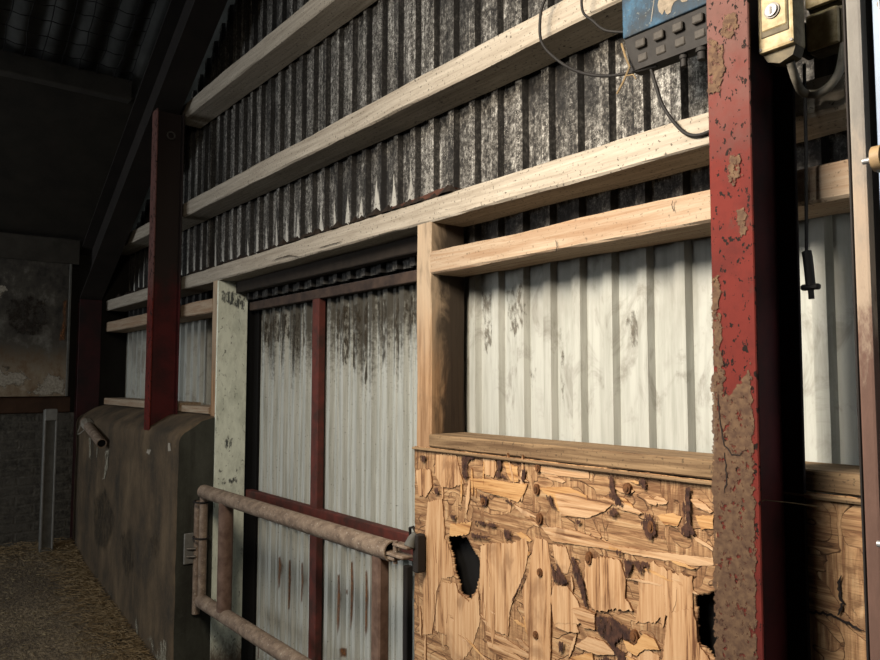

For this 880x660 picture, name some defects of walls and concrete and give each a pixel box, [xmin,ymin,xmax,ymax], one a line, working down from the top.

peeling [707,12,739,93]
peeling [727,155,743,186]
peeling [736,207,748,237]
damp [263,313,313,371]
damp [336,295,417,384]
peeling [416,275,758,660]
corrosion [278,557,303,609]
corrosion [337,562,353,633]